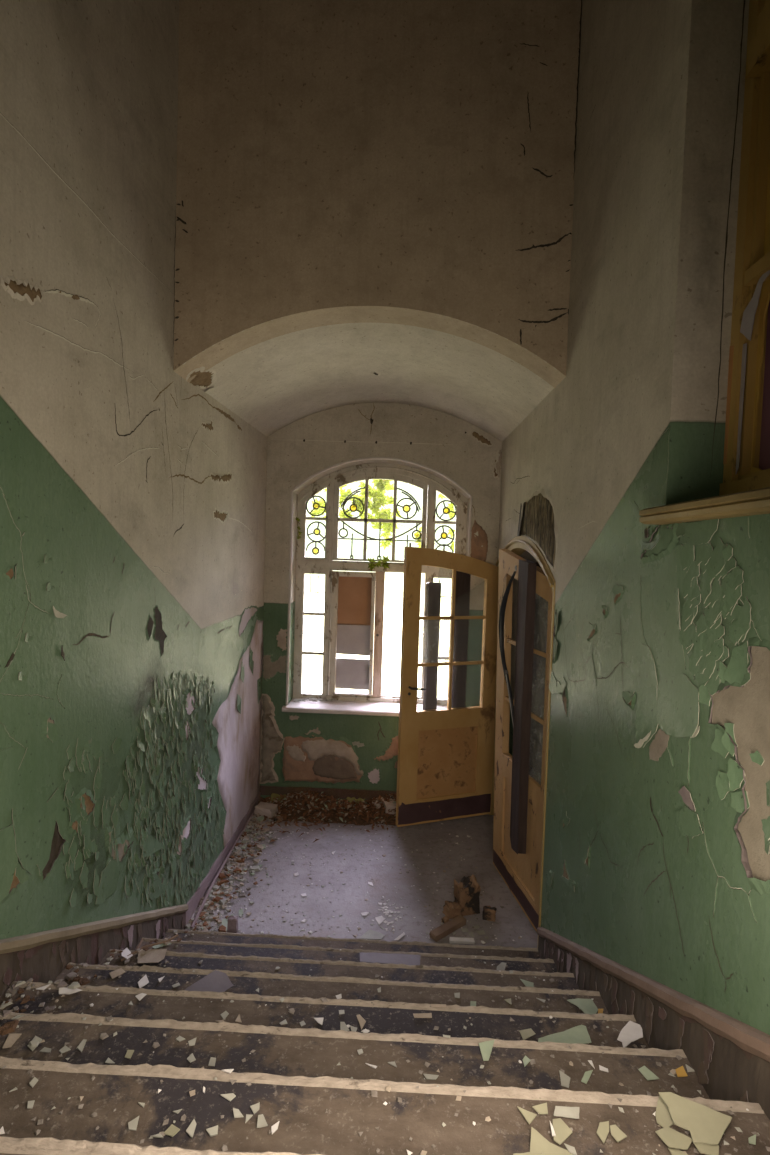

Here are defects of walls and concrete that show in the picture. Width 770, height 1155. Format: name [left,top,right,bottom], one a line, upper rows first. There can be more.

crack [515,0,582,272]
flaking render [1,275,101,327]
crack [518,308,569,344]
crack [106,277,242,537]
flaking render [186,366,217,394]
flaking render [171,420,232,515]
flaking render [517,488,558,574]
peeling [145,588,167,656]
peeling [622,519,770,895]
peeling [0,605,398,1005]
peeling [2,1033,87,1053]
peeling [176,1036,234,1073]